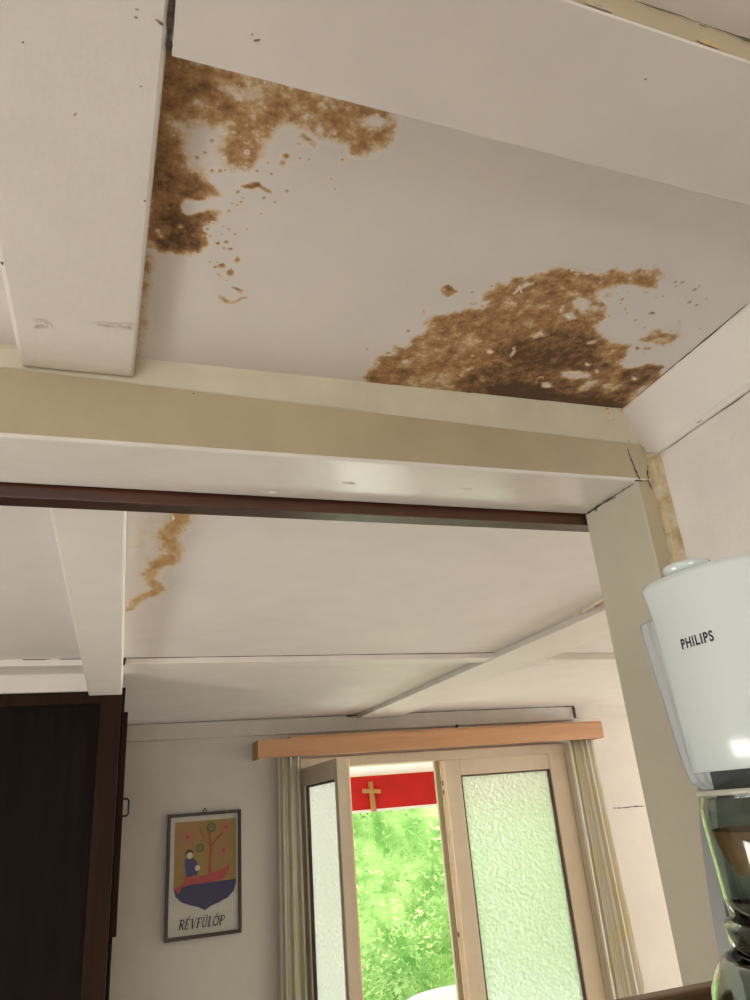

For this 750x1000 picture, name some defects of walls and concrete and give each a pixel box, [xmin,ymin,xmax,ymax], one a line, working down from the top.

damp [136,49,403,359]
damp [359,263,710,422]
crack [585,449,652,515]
damp [125,512,196,614]